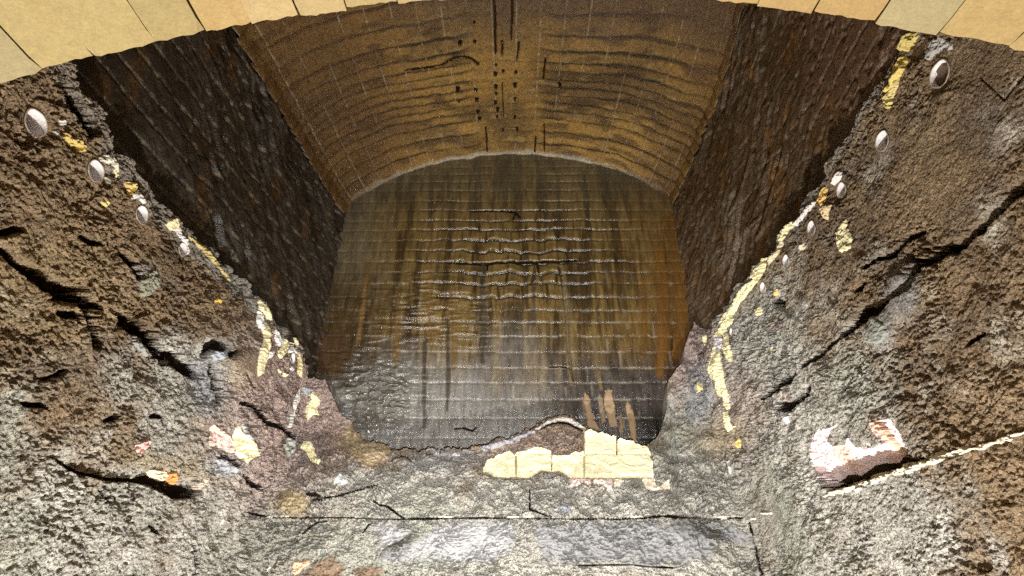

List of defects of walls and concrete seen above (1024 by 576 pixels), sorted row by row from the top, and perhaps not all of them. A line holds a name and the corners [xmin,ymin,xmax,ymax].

crack [405,0,520,153]
crack [534,123,545,153]
crack [0,226,296,440]
crack [761,189,1024,413]
spalling [208,423,261,463]
crack [219,453,764,576]
flaking render [431,429,670,492]
spalling [809,419,924,489]